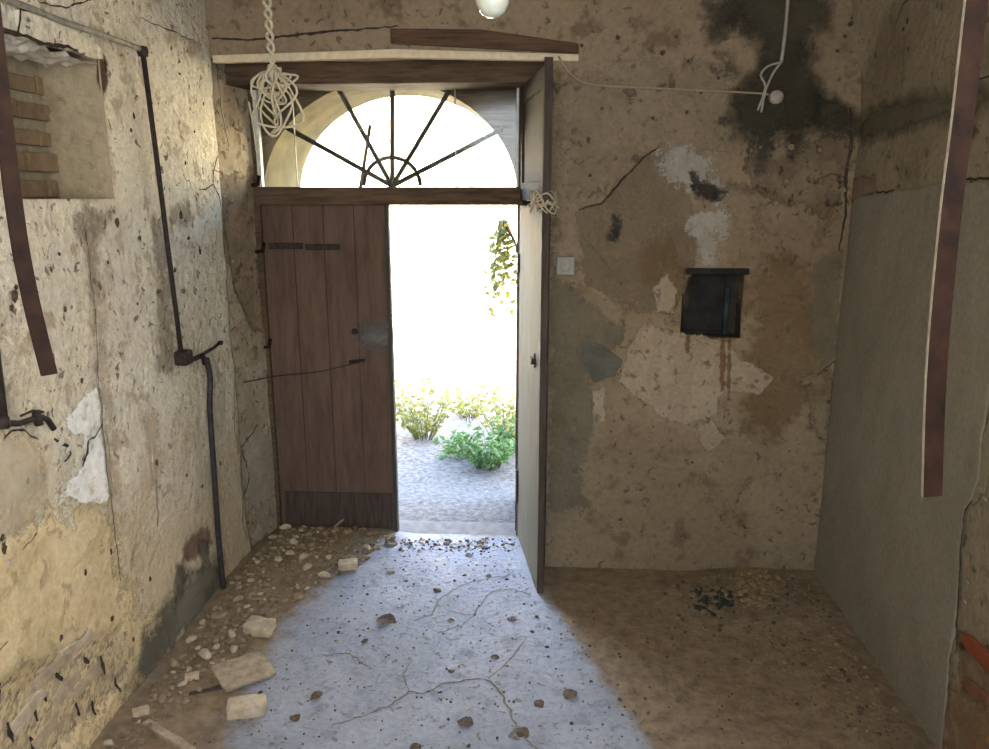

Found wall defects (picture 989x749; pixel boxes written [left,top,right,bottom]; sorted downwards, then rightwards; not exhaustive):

crack [140,17,399,45]
damp [702,0,953,169]
crack [817,107,902,251]
crack [966,164,989,183]
flaking render [576,147,774,451]
flaking render [0,388,162,749]
crack [414,570,531,633]
crack [332,637,538,749]
spalling [955,629,989,712]